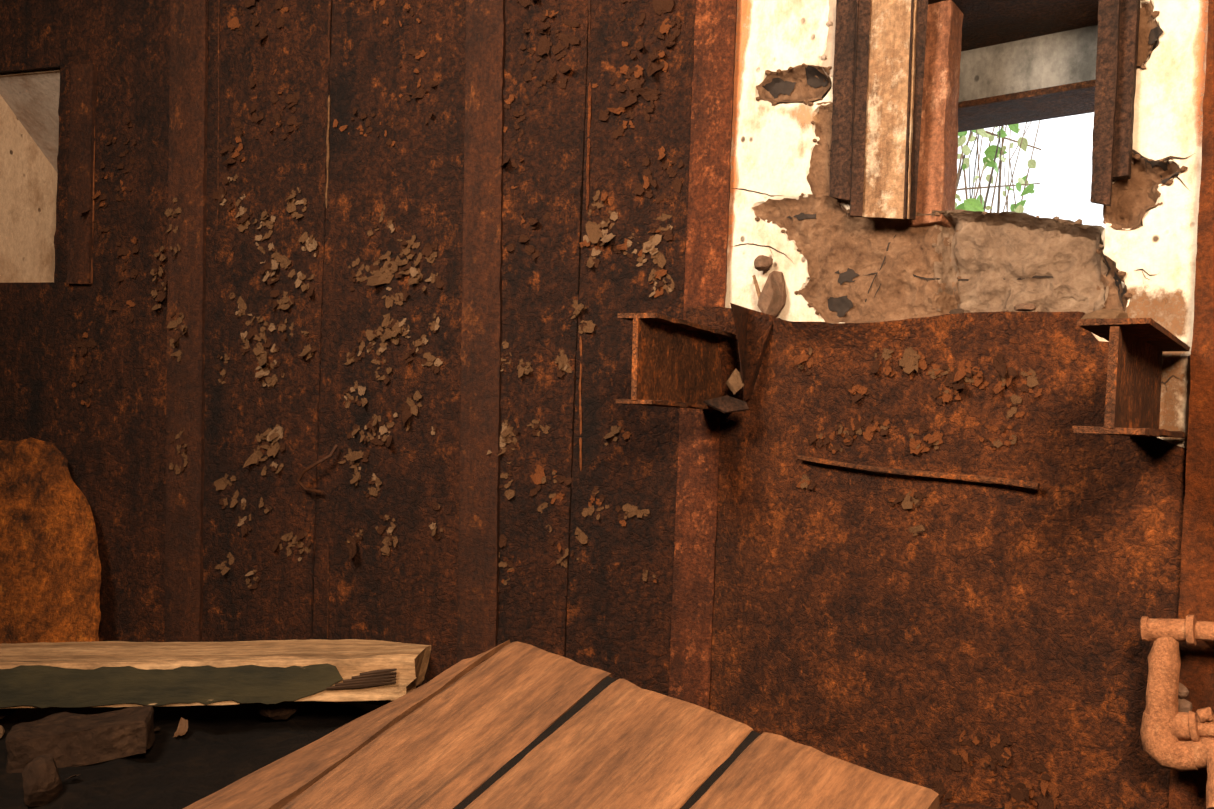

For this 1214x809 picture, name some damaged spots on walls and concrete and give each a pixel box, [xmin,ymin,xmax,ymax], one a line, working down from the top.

rust [592,0,681,139]
rust [1195,0,1209,141]
rust [80,118,187,362]
rust [212,69,318,387]
rust [579,146,683,298]
spalling [752,0,1188,323]
rust [214,424,285,536]
rust [338,205,445,498]
rust [487,419,650,568]
rust [571,300,596,334]
rust [908,423,943,455]
rust [846,347,1042,450]